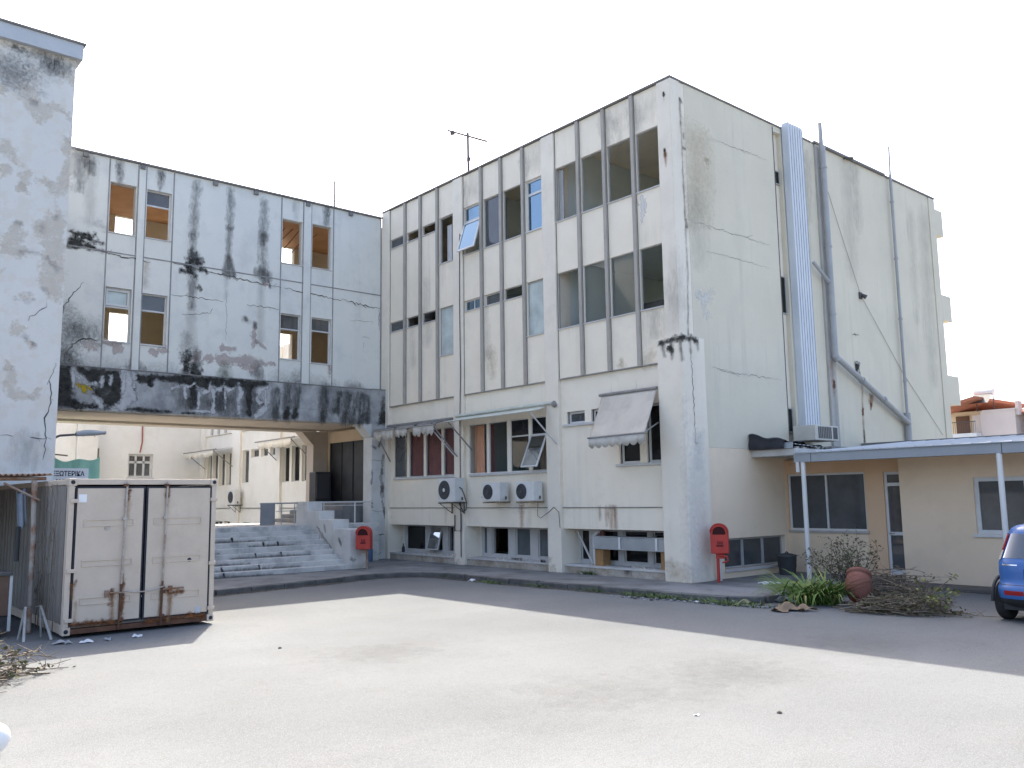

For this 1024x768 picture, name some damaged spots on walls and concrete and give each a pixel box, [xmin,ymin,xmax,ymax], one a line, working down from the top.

mould [66,230,104,251]
leakage [180,217,208,308]
leakage [225,228,235,277]
crack [689,219,769,268]
crack [98,250,380,339]
peeling [192,317,275,372]
leakage [658,334,698,353]
crack [9,338,96,458]
leakage [57,350,298,419]
leakage [320,386,385,425]
corrosion [145,612,205,623]